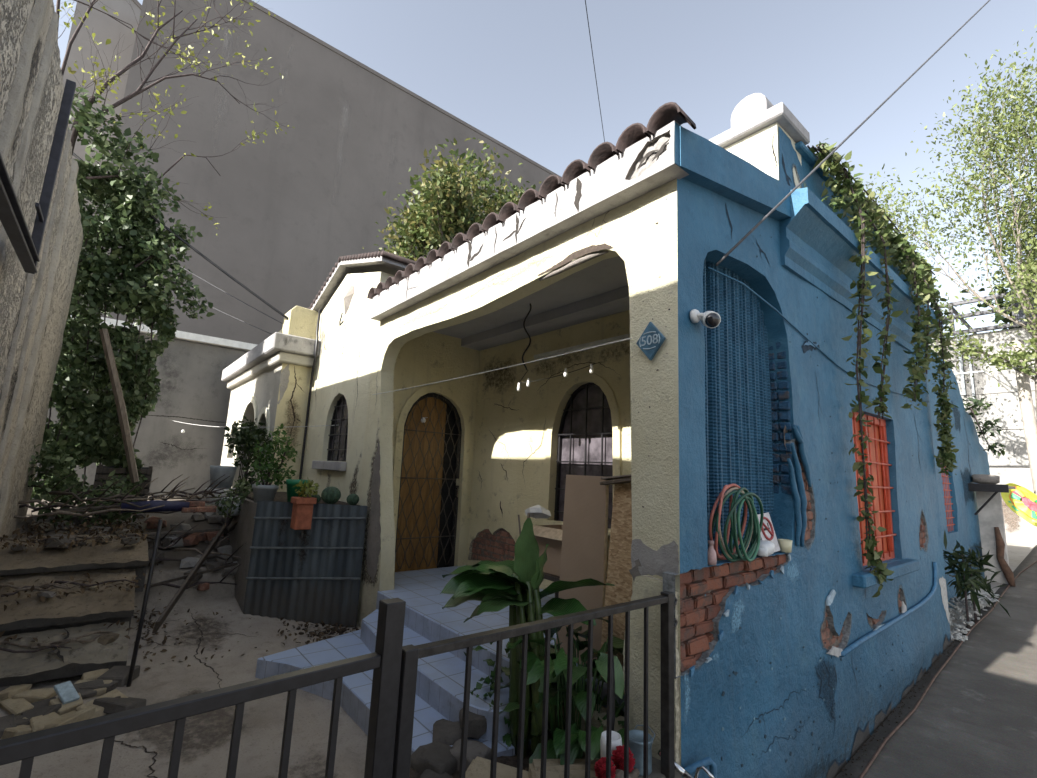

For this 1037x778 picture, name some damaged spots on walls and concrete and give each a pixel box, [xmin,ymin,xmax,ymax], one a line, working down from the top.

spalling [629,421,838,713]
spalling [866,585,907,631]
spalling [919,510,935,559]
peeling [939,577,950,621]
crack [133,613,255,687]
spalling [805,581,861,718]
spalling [818,635,951,778]
crack [114,740,158,778]